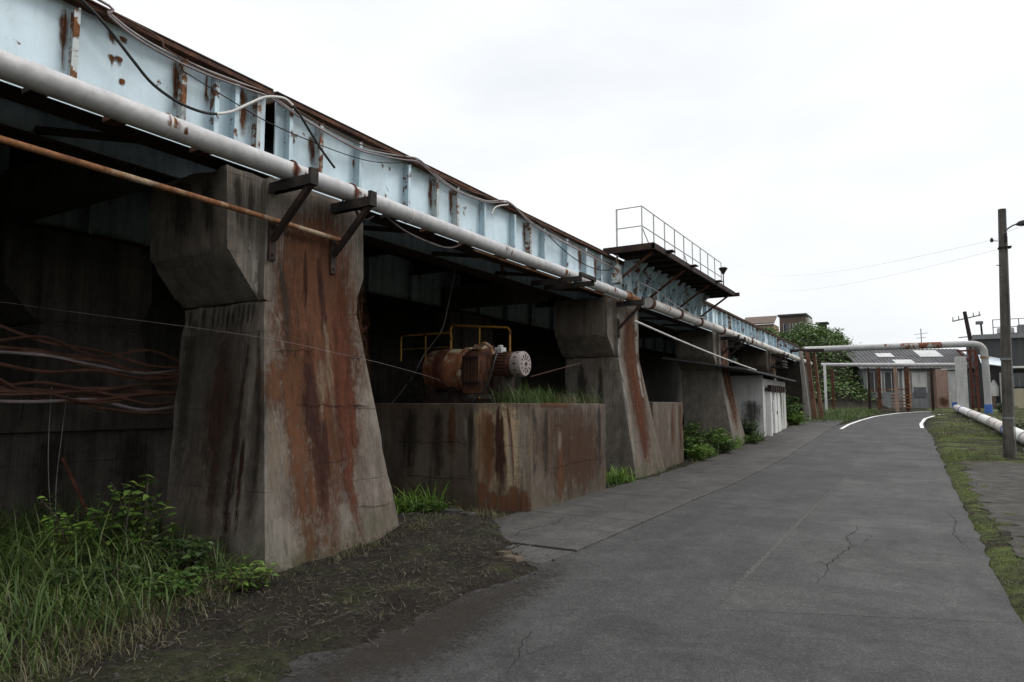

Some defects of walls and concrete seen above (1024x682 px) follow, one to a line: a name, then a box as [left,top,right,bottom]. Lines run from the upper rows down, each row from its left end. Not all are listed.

rust [60,10,68,64]
rust [169,62,188,135]
rust [267,210,365,555]
rust [623,311,648,458]
rust [478,407,531,511]